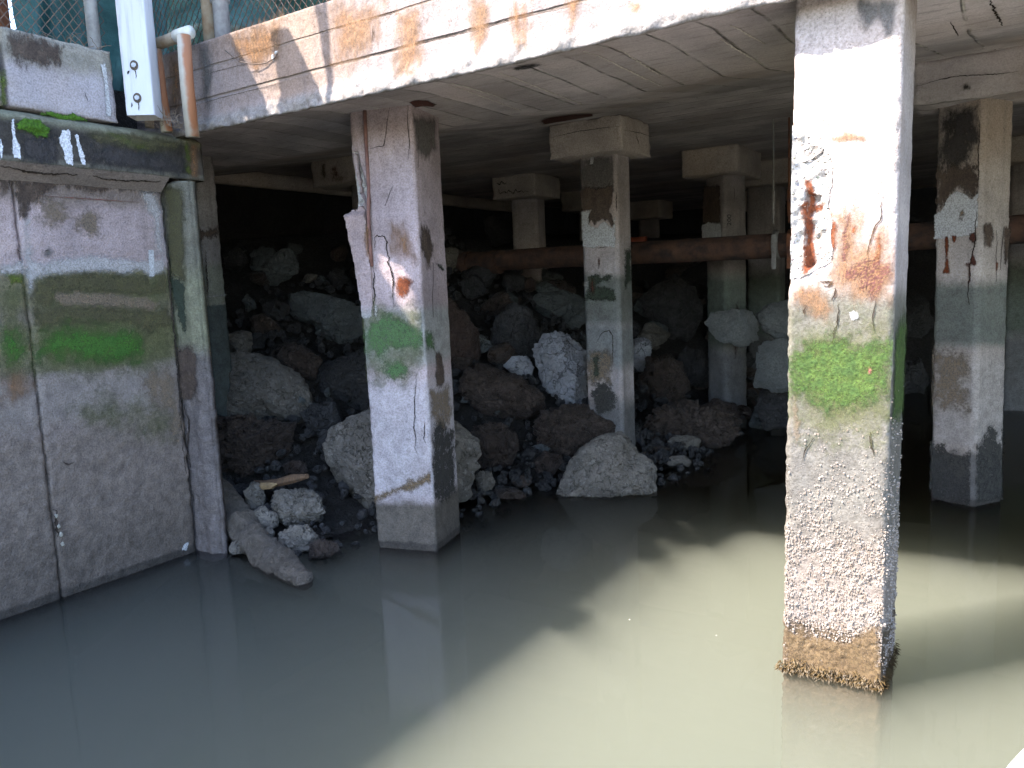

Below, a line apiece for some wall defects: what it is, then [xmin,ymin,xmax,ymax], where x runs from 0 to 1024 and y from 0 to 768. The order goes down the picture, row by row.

spalling [352,110,373,266]
crack [373,235,394,313]
rust [396,277,413,298]
leakage [580,157,614,226]
spalling [790,125,833,279]
rust [801,180,824,275]
rust [830,214,893,300]
crack [866,194,884,332]
peeling [934,191,978,239]
leakage [935,107,980,209]
leakage [374,353,457,504]
leakage [929,425,1004,505]